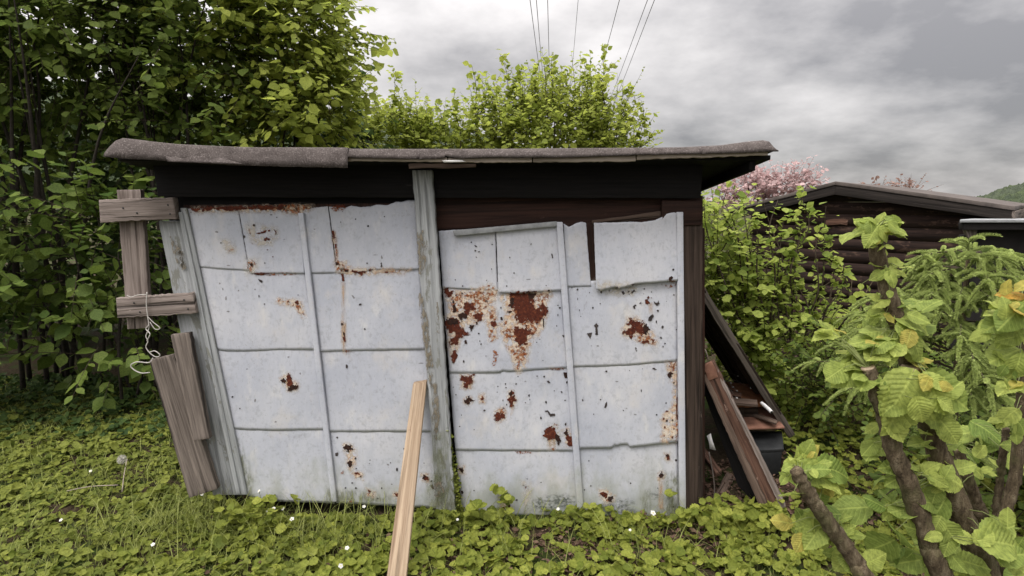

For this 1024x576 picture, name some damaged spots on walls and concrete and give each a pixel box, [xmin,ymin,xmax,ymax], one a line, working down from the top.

rust [190,203,310,276]
rust [332,231,411,299]
rust [278,298,304,315]
rust [443,285,551,404]
rust [622,317,656,345]
rust [280,373,298,391]
rust [494,390,517,421]
rust [543,423,572,450]
rust [658,362,678,508]
rust [341,444,363,478]